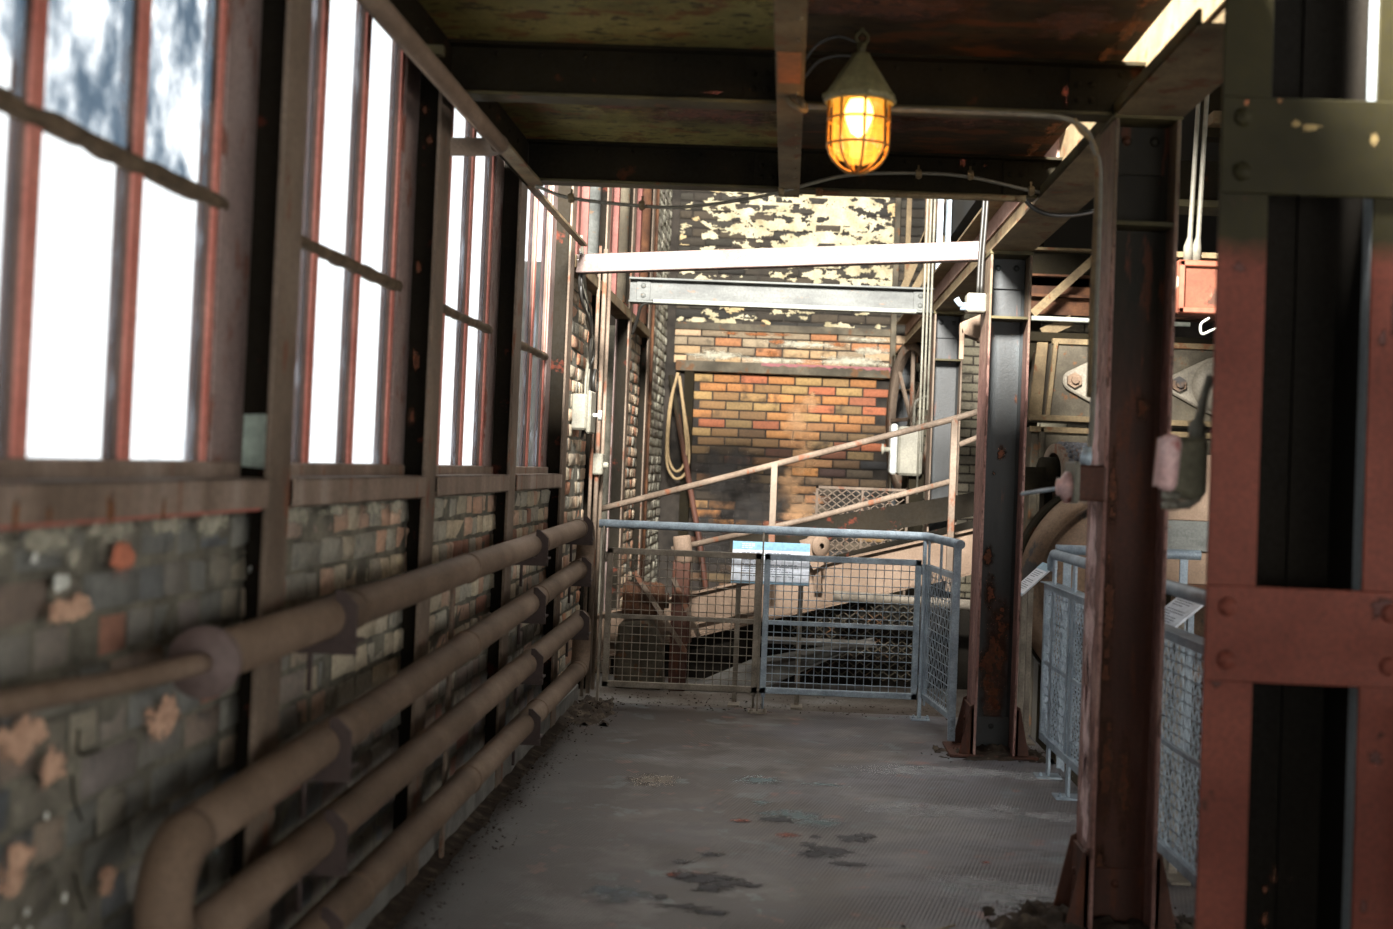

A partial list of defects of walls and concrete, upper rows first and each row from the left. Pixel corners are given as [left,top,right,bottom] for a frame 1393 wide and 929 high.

peeling [680,191,895,250]
peeling [769,265,893,286]
peeling [677,307,886,329]
spalling [110,541,136,579]
spalling [48,592,93,625]
corrosion [979,545,1009,717]
corrosion [1098,446,1132,843]
spalling [144,694,182,742]
spalling [0,714,67,788]
spalling [0,840,37,898]